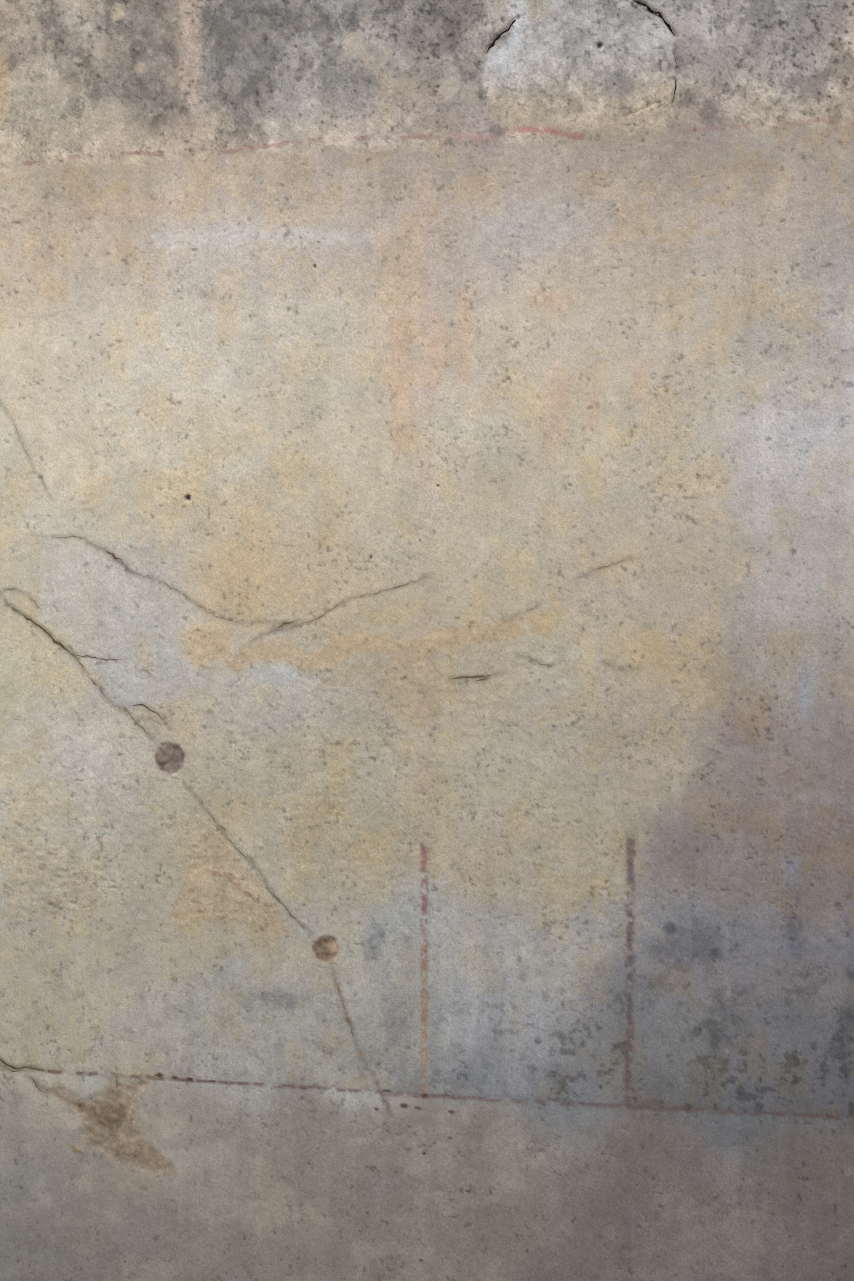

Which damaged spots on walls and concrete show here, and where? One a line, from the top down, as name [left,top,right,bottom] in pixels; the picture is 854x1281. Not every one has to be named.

water stain [172,0,208,164]
water stain [303,41,398,136]
crack [629,0,677,114]
crack [37,535,424,643]
crack [2,588,167,738]
crack [183,782,309,931]
crack [0,1059,45,1093]
flaking render [21,1071,217,1228]
crack [333,971,390,1112]
peeling [372,1089,430,1129]